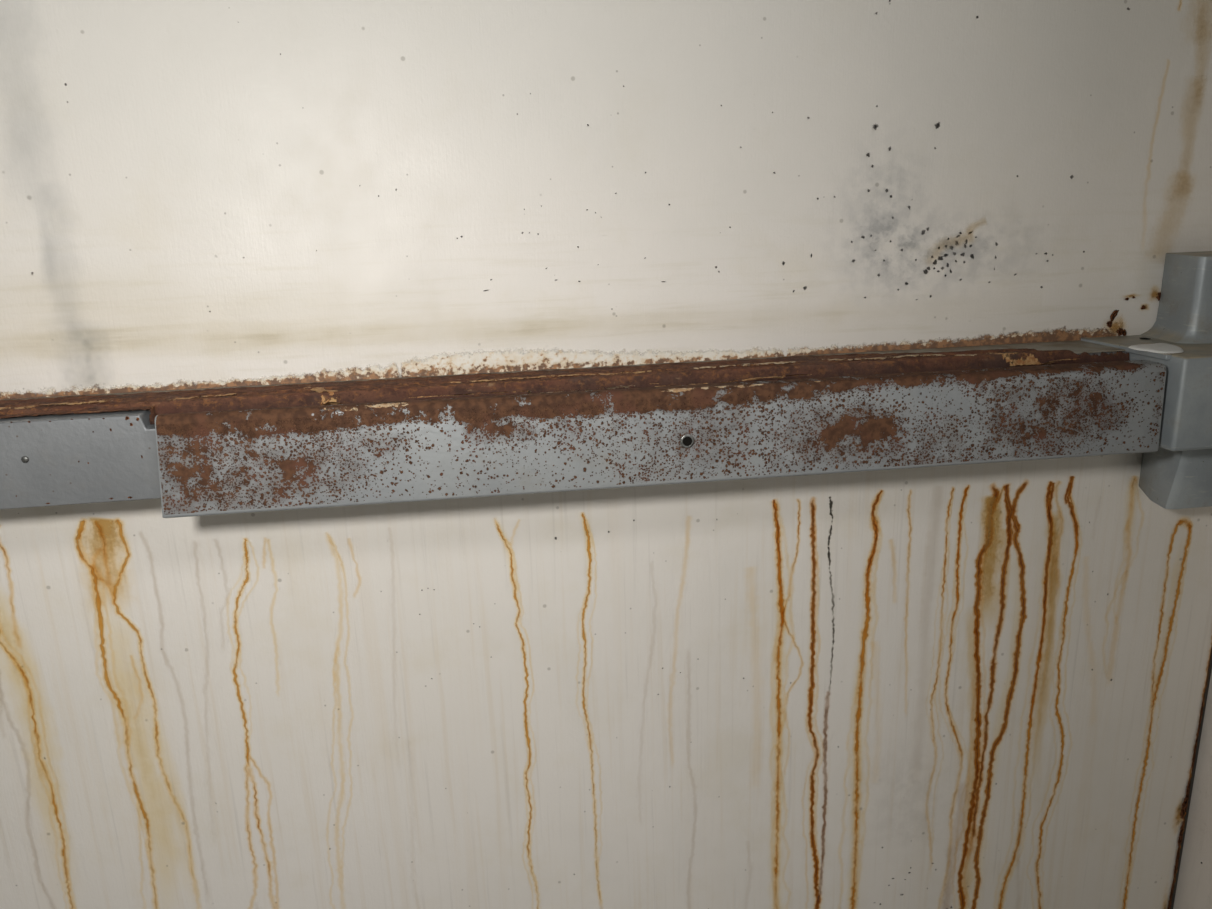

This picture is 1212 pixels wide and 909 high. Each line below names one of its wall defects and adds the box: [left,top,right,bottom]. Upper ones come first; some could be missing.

corrosion [0,348,1166,514]
corrosion [76,520,141,714]
corrosion [511,555,531,768]
corrosion [582,514,591,650]
corrosion [773,502,784,736]
corrosion [798,503,821,909]
corrosion [855,491,882,828]
corrosion [942,487,968,621]
corrosion [958,483,1026,909]
corrosion [1000,476,1078,909]
corrosion [1124,520,1191,909]
corrosion [1167,684,1207,909]